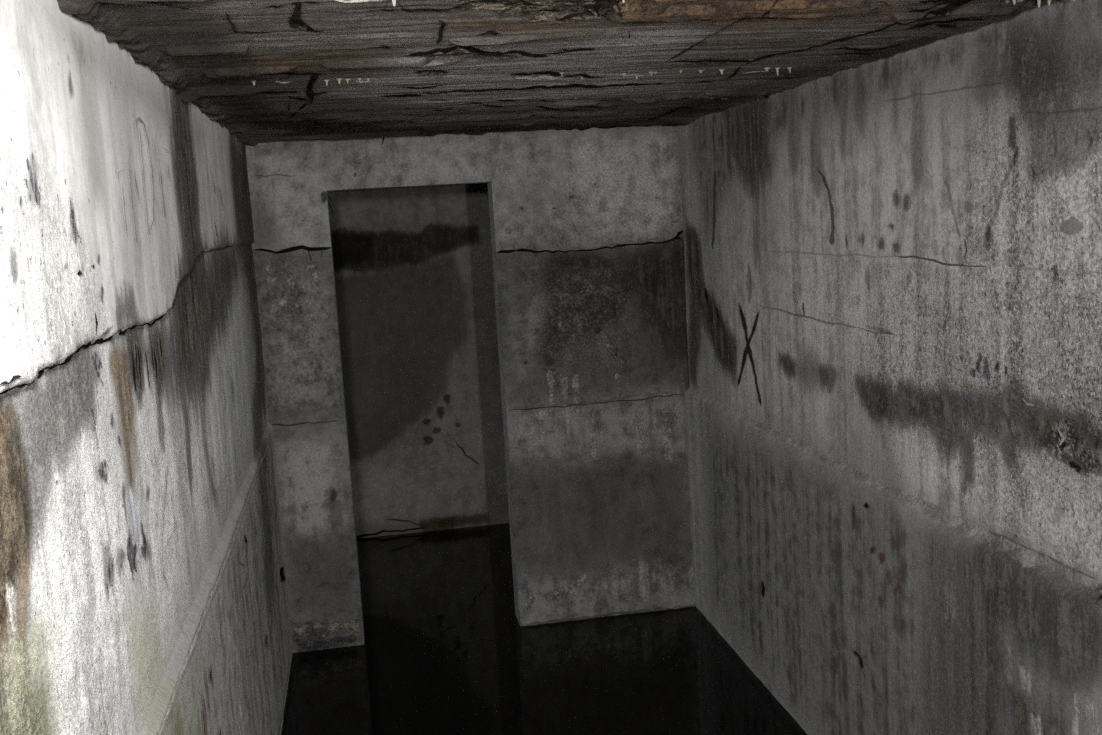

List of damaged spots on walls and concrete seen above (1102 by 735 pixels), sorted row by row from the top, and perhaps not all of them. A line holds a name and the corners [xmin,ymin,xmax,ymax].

crack [147,1,326,34]
crack [368,0,984,97]
crack [195,175,331,261]
damp [11,273,95,558]
crack [0,299,175,395]
corrosion [110,346,137,514]
damp [59,0,771,679]
damp [779,353,835,391]
damp [857,378,1101,491]
peeling [957,352,1007,389]
spalling [1035,407,1102,476]
corrosion [0,398,32,735]